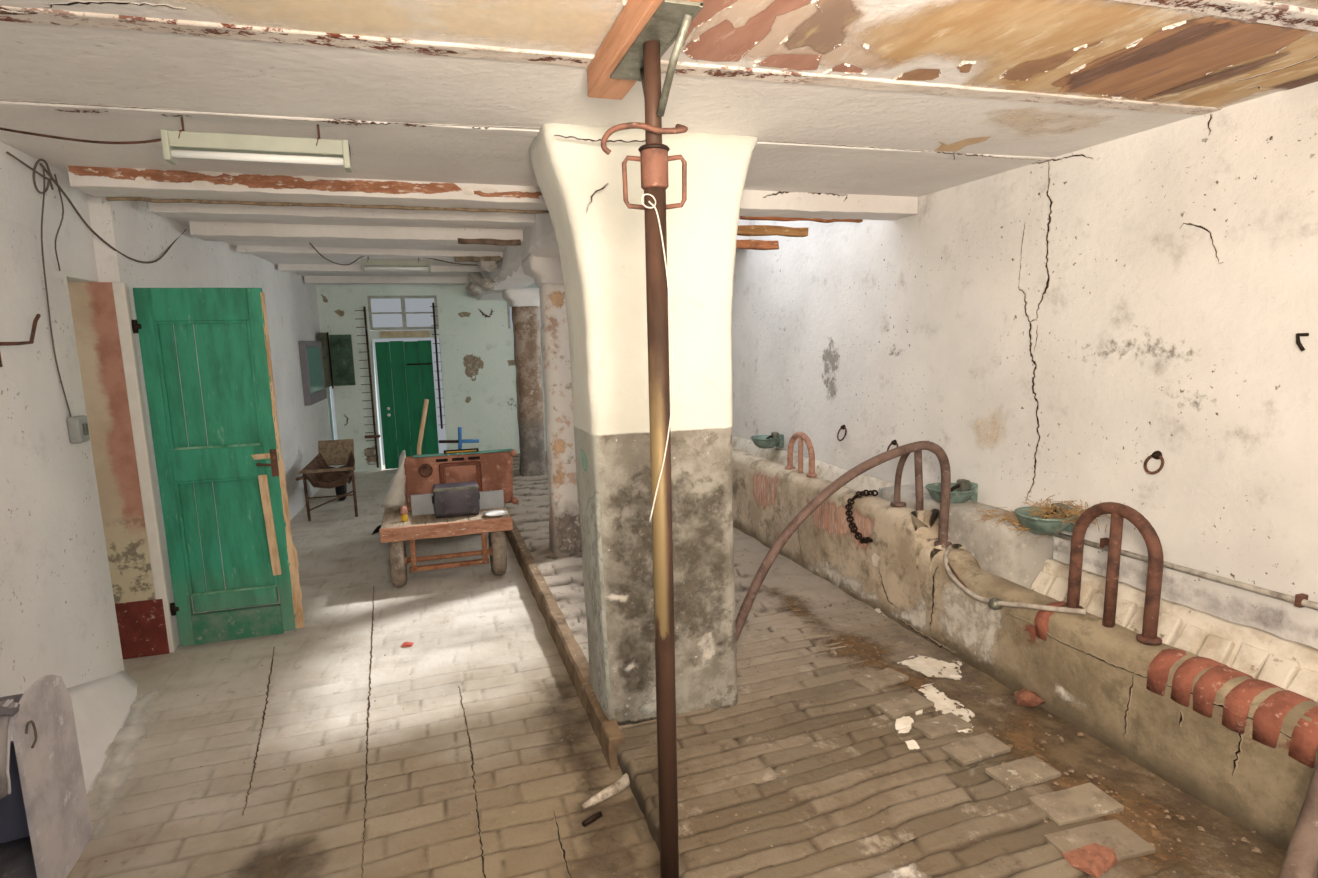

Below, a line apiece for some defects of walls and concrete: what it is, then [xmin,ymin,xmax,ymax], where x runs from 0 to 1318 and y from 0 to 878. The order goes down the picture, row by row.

peeling [681,0,976,81]
peeling [999,16,1318,100]
crack [289,119,645,143]
crack [586,183,608,212]
crack [1180,223,1223,264]
peeling [549,292,565,353]
crack [760,140,1093,501]
crack [1007,613,1318,776]
crack [458,686,487,878]
water stain [239,839,320,878]
crack [553,811,572,878]